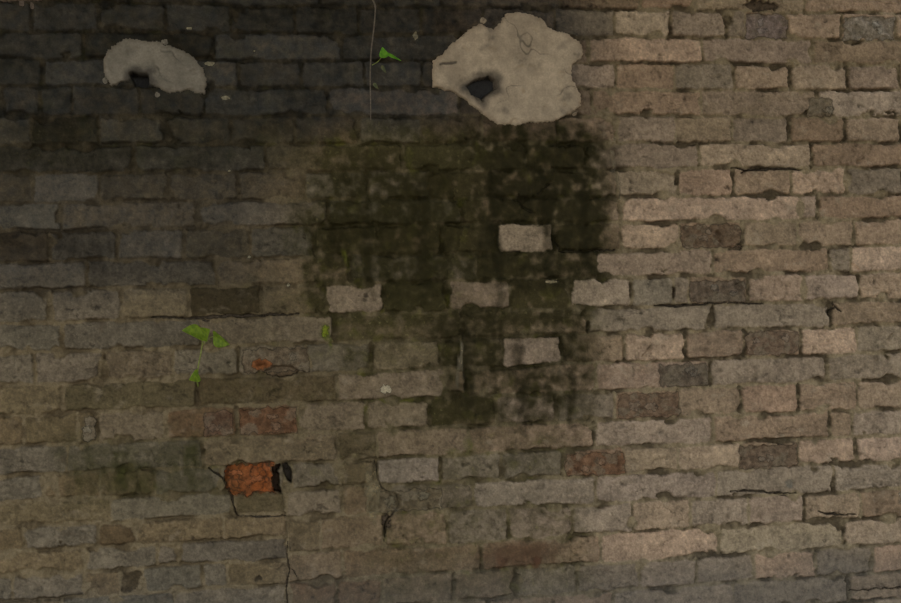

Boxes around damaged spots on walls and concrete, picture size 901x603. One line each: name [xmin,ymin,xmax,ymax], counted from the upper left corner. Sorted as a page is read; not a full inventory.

crack [286,541,297,603]